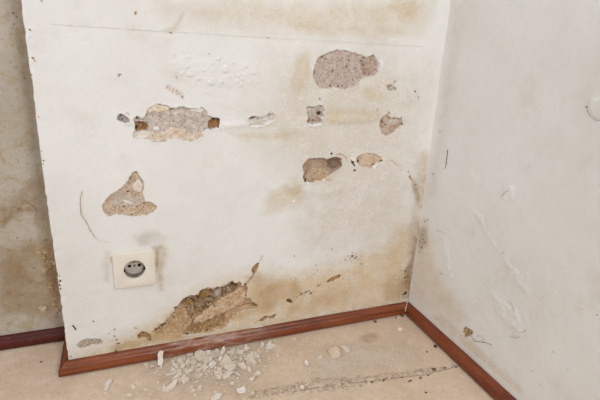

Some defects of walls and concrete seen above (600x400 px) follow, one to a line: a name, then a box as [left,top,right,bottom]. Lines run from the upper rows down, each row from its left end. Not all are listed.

flaking render [313,48,384,89]
flaking render [117,104,220,142]
flaking render [248,112,275,129]
flaking render [307,98,324,128]
flaking render [380,113,403,136]
flaking render [303,152,399,185]
flaking render [102,171,157,216]
flaking render [136,255,263,340]
damp [229,243,412,327]
peeling [76,338,103,348]